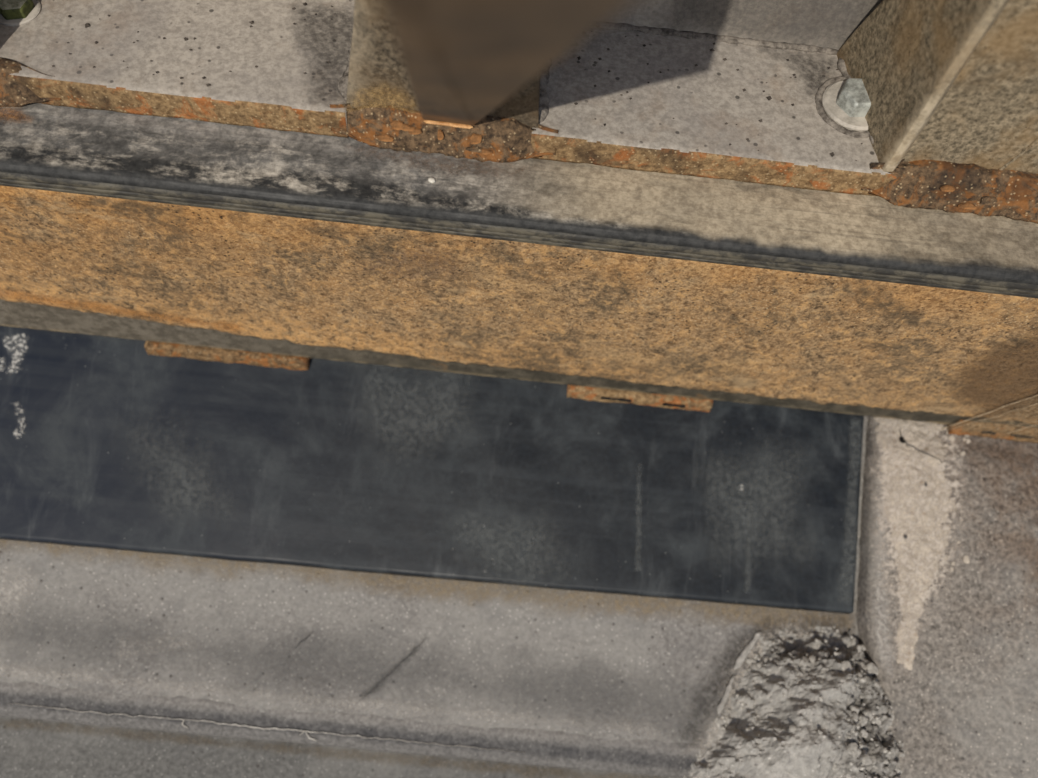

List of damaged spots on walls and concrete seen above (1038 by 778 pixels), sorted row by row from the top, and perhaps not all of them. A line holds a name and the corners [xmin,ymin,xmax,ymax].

corrosion [0,57,61,107]
corrosion [330,91,558,163]
corrosion [861,159,1038,224]
spalling [683,622,905,778]